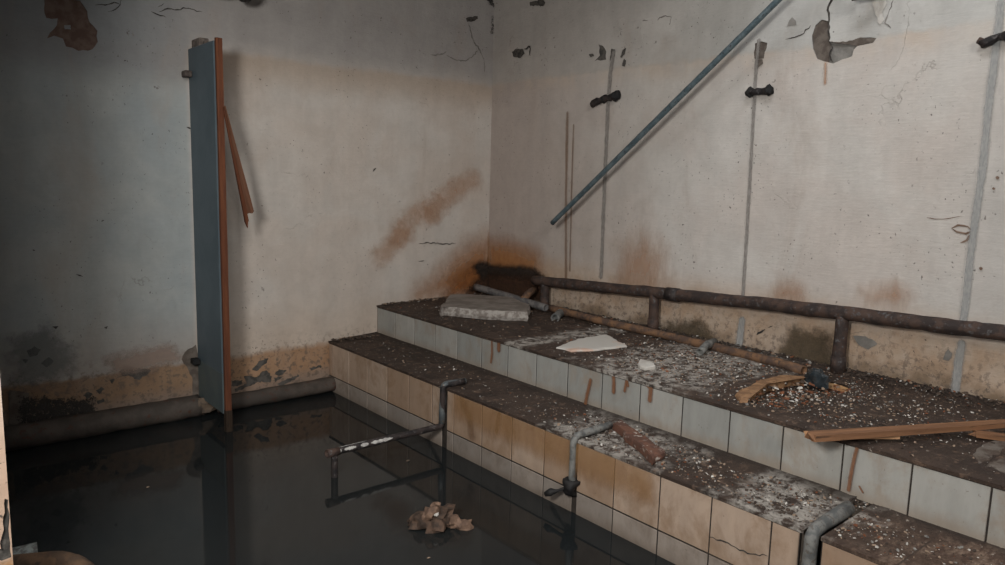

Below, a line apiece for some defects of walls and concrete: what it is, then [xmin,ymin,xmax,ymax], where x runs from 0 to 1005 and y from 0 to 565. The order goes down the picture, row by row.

peeling [44,0,98,51]
crack [151,4,201,17]
spalling [812,20,876,63]
peeling [232,358,299,392]
water stain [15,393,96,424]